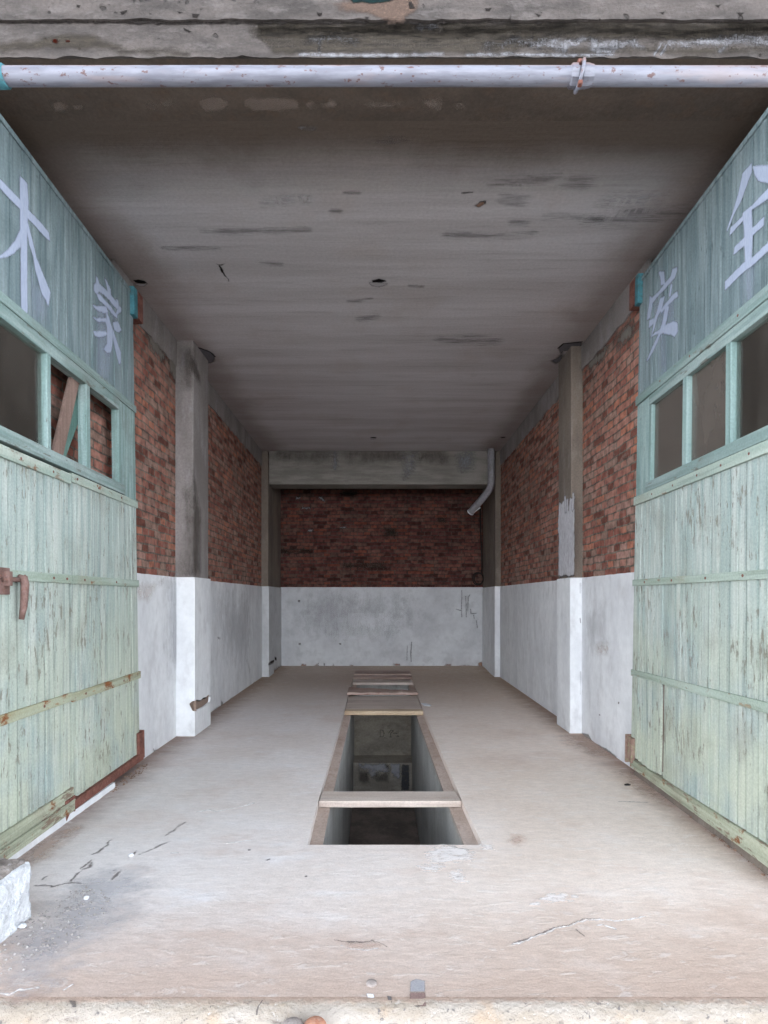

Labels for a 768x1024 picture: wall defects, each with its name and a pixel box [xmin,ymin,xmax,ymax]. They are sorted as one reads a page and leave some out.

spalling [341,0,419,22]
crack [35,803,253,887]
crack [512,916,645,945]